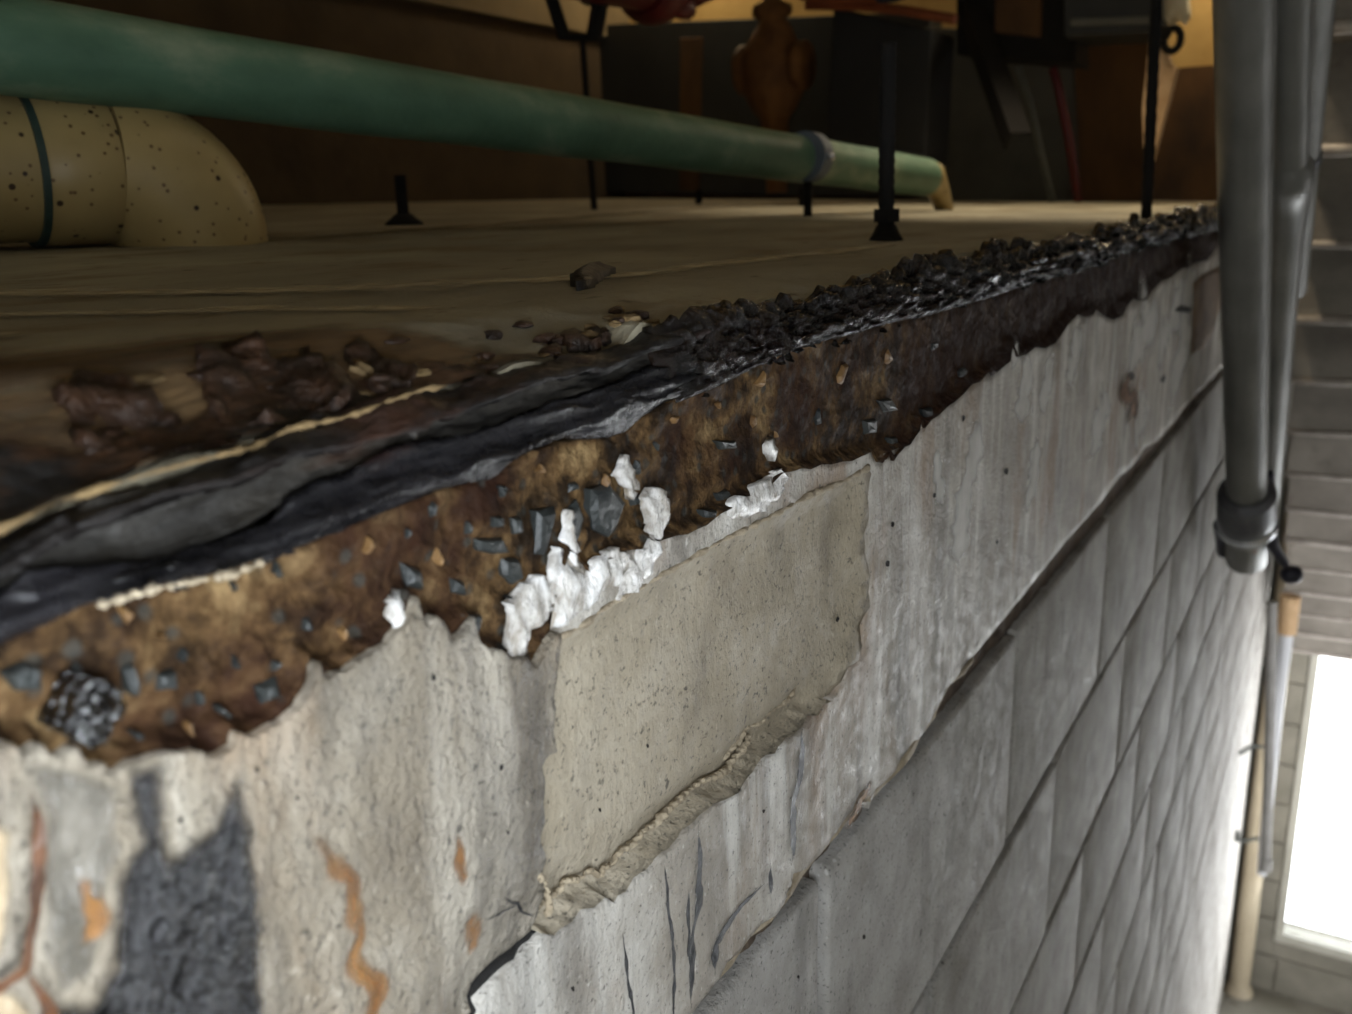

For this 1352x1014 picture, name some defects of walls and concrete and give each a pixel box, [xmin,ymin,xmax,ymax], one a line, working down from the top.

spalling [0,231,1221,769]
crack [467,897,537,1014]
crack [623,936,635,1014]
crack [665,733,805,1014]